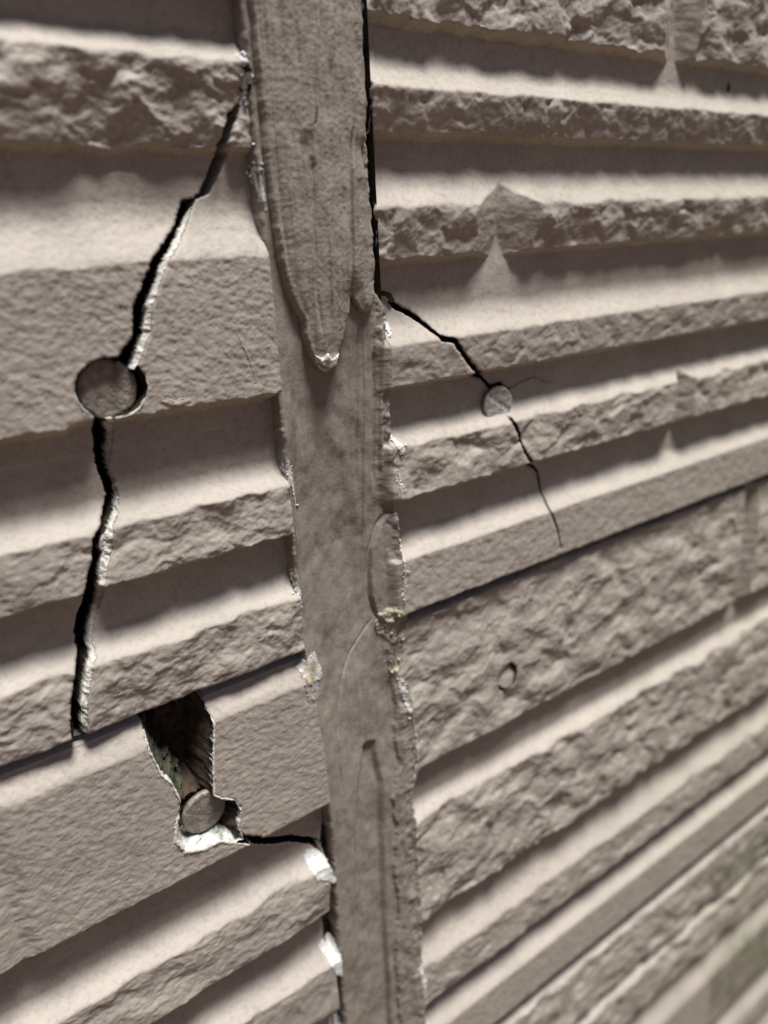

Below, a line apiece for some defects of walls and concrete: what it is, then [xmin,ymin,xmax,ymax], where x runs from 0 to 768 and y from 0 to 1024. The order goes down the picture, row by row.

crack [115,45,256,369]
crack [381,291,550,389]
crack [509,418,562,548]
crack [70,413,119,739]
spalling [137,692,244,855]